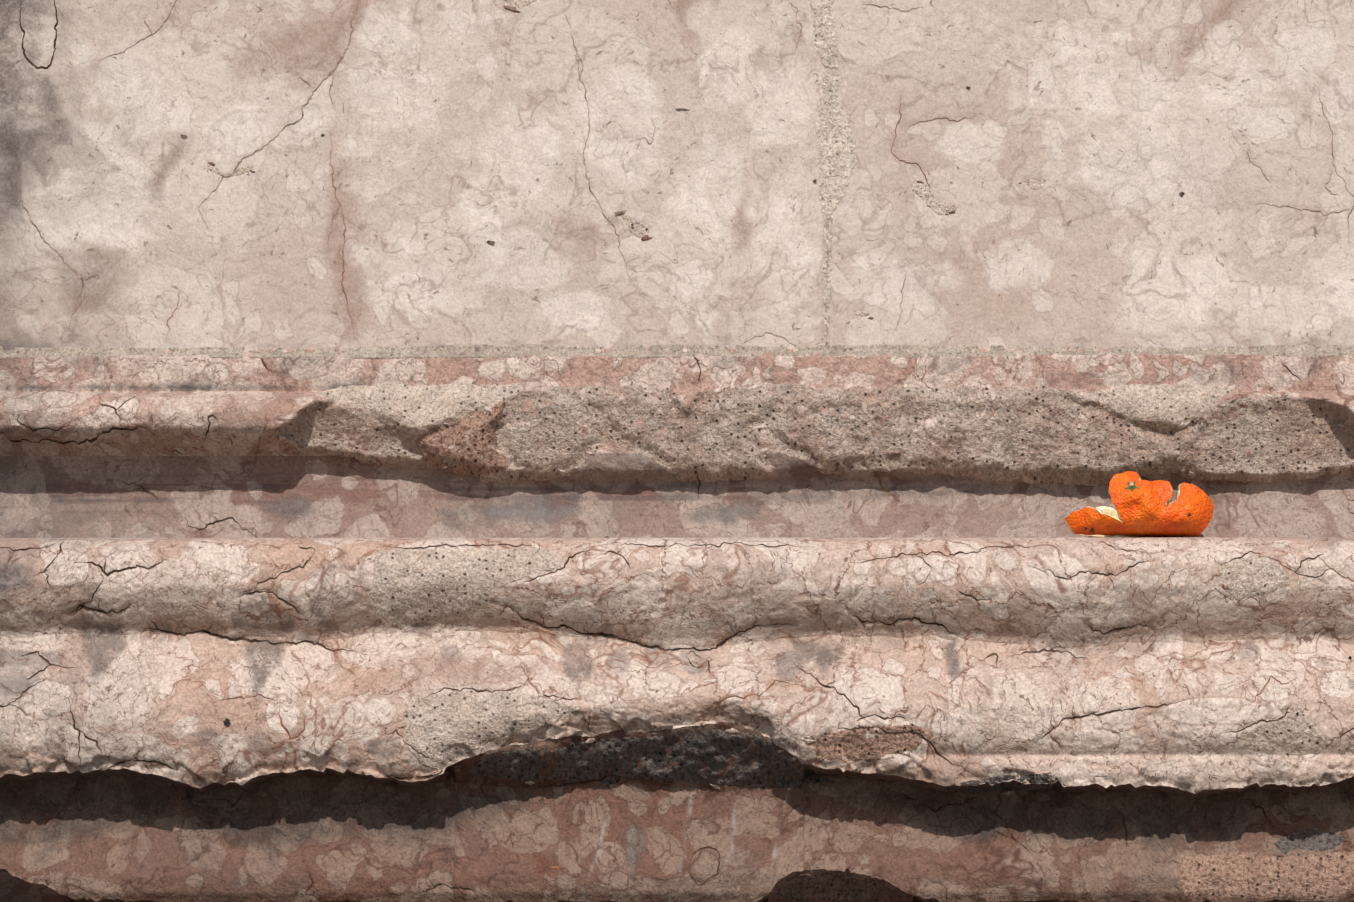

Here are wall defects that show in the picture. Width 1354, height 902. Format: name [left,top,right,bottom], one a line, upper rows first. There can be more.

crack [19,0,58,69]
crack [198,0,359,231]
spalling [275,383,1354,537]
crack [0,540,357,652]
crack [857,541,1153,592]
crack [1218,551,1354,586]
crack [984,624,1152,666]
crack [0,651,178,770]
spalling [461,721,926,790]
crack [379,542,1030,852]
spalling [947,771,1068,795]
crack [1037,700,1184,749]